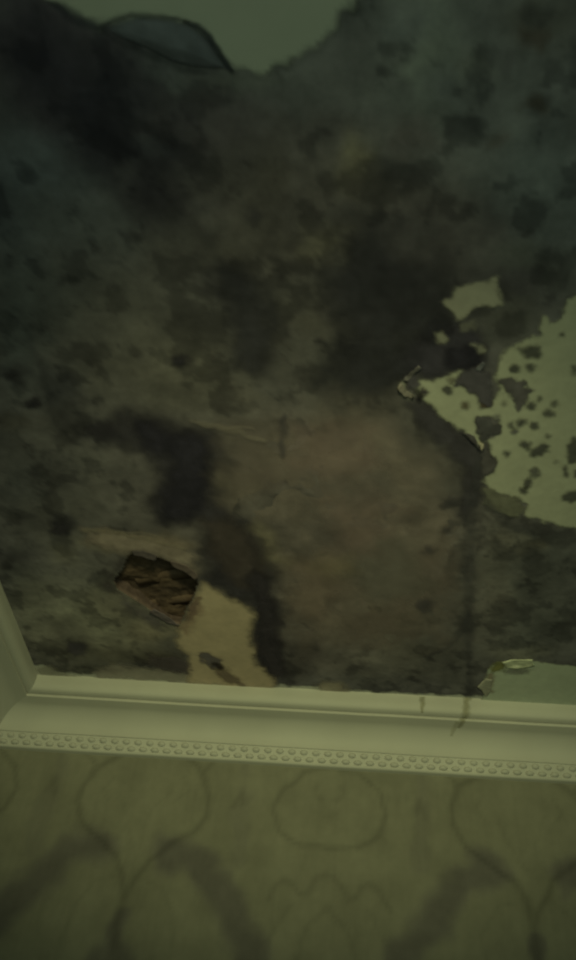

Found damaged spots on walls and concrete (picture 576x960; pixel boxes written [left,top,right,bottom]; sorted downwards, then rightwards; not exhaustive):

leakage [0,0,576,696]
peeling [444,277,503,320]
peeling [397,296,576,528]
peeling [89,530,275,688]
peeling [478,659,576,705]